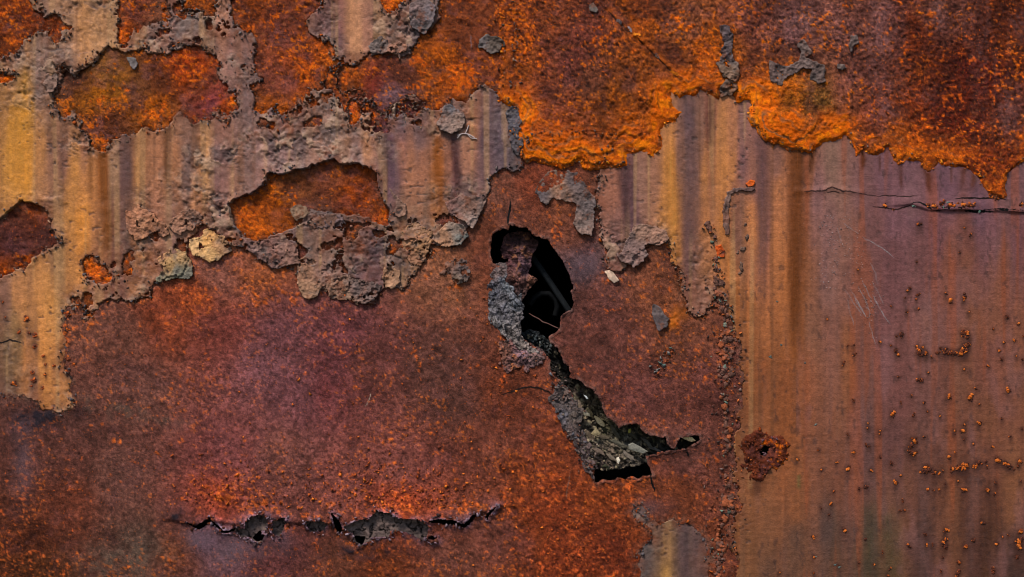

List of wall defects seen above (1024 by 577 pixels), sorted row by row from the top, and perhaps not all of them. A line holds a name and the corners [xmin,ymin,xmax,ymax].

peeling [716,25,740,97]
rust [433,213,458,227]
peeling [535,170,596,236]
crack [806,186,1024,213]
rust [79,250,138,290]
peeling [125,188,487,306]
rust [500,230,539,302]
peeling [616,224,669,268]
peeling [487,262,545,374]
crack [501,386,552,395]
rust [919,446,1022,492]
crack [180,503,501,548]